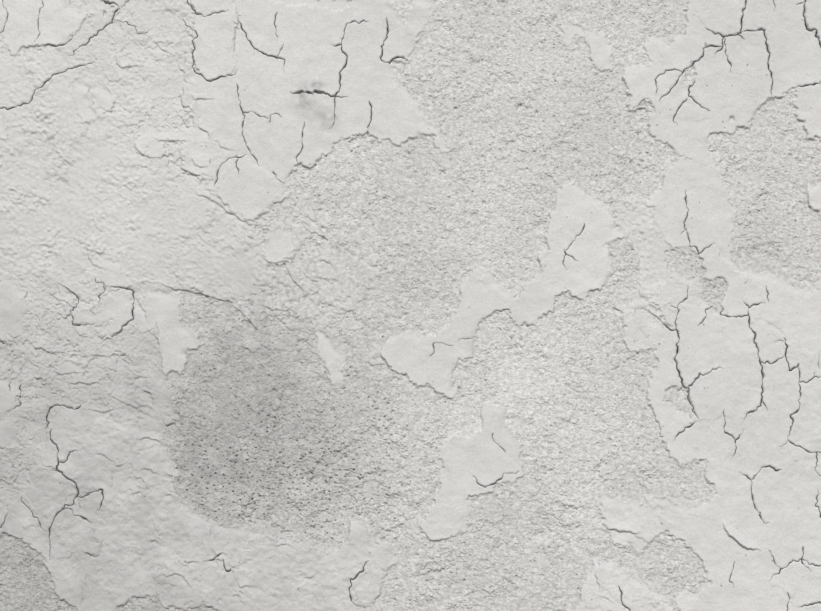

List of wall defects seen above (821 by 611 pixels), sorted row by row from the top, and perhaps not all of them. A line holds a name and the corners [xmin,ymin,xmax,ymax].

crack [184,0,285,186]
crack [291,18,407,128]
crack [655,0,821,125]
crack [0,401,104,560]
peeling [0,0,274,511]
peeling [160,0,717,611]
crack [664,289,722,441]
peeling [664,246,729,314]
crack [698,287,821,523]
peeling [707,88,821,292]
peeling [0,533,78,611]
peeling [116,595,218,611]